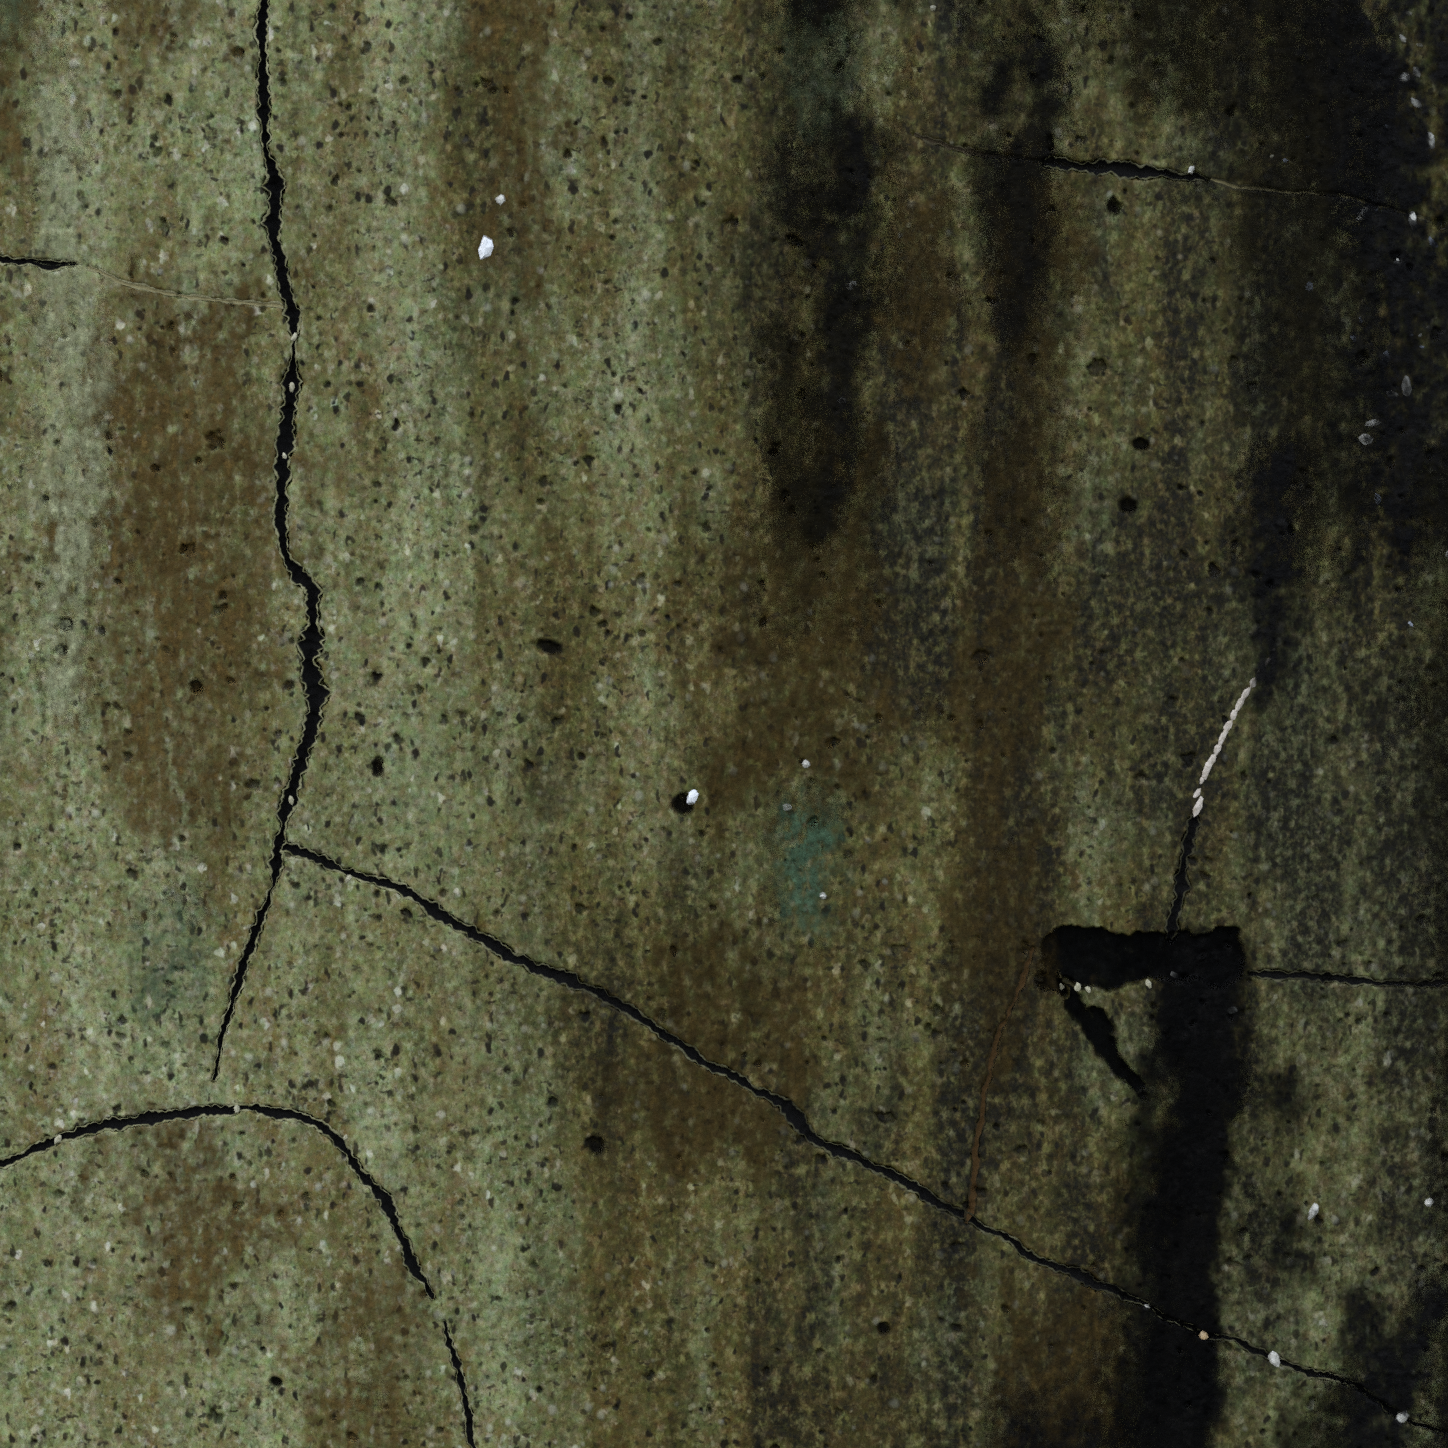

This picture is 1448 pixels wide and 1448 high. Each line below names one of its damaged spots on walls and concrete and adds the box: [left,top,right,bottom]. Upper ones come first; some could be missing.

damp [977,0,1067,344]
crack [914,132,1364,203]
damp [762,100,893,542]
damp [1109,0,1448,717]
crack [0,0,1147,1306]
crack [1164,677,1256,939]
crack [1249,969,1448,989]
crack [442,1321,477,1448]
damp [1010,924,1251,1448]
crack [1153,1308,1366,1396]
damp [1263,1193,1319,1278]
damp [1278,1280,1448,1448]